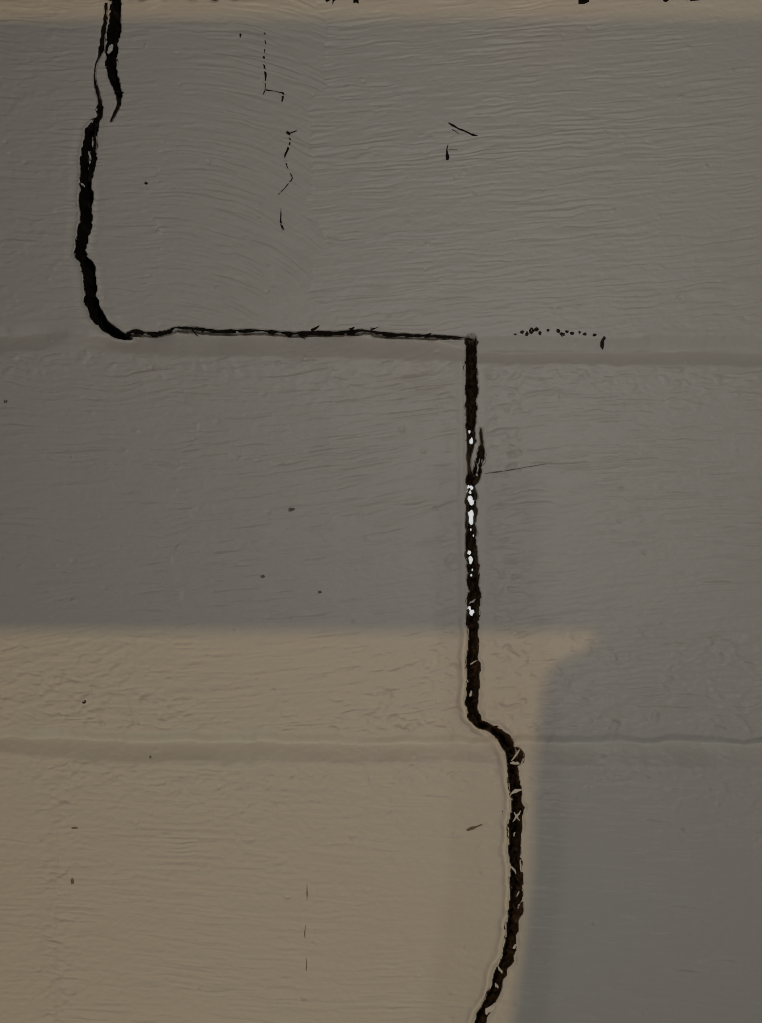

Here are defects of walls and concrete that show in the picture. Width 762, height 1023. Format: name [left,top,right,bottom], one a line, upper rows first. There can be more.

crack [74,0,543,1023]